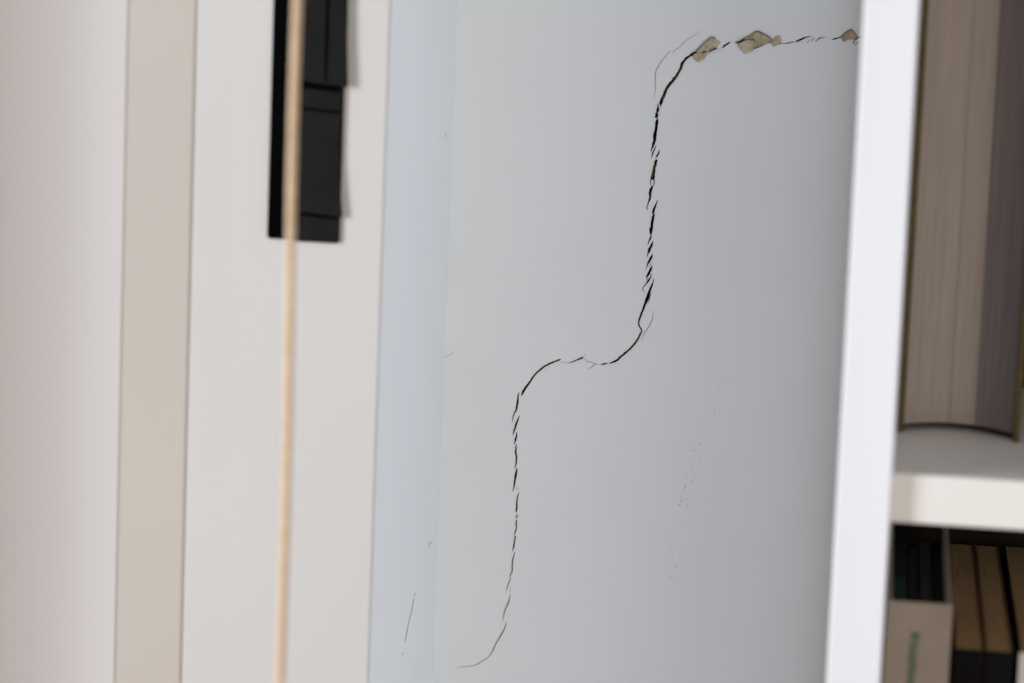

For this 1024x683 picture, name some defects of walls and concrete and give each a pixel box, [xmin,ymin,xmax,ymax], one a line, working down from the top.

spalling [692,36,722,62]
spalling [737,31,782,53]
spalling [841,29,859,45]
crack [467,32,860,667]